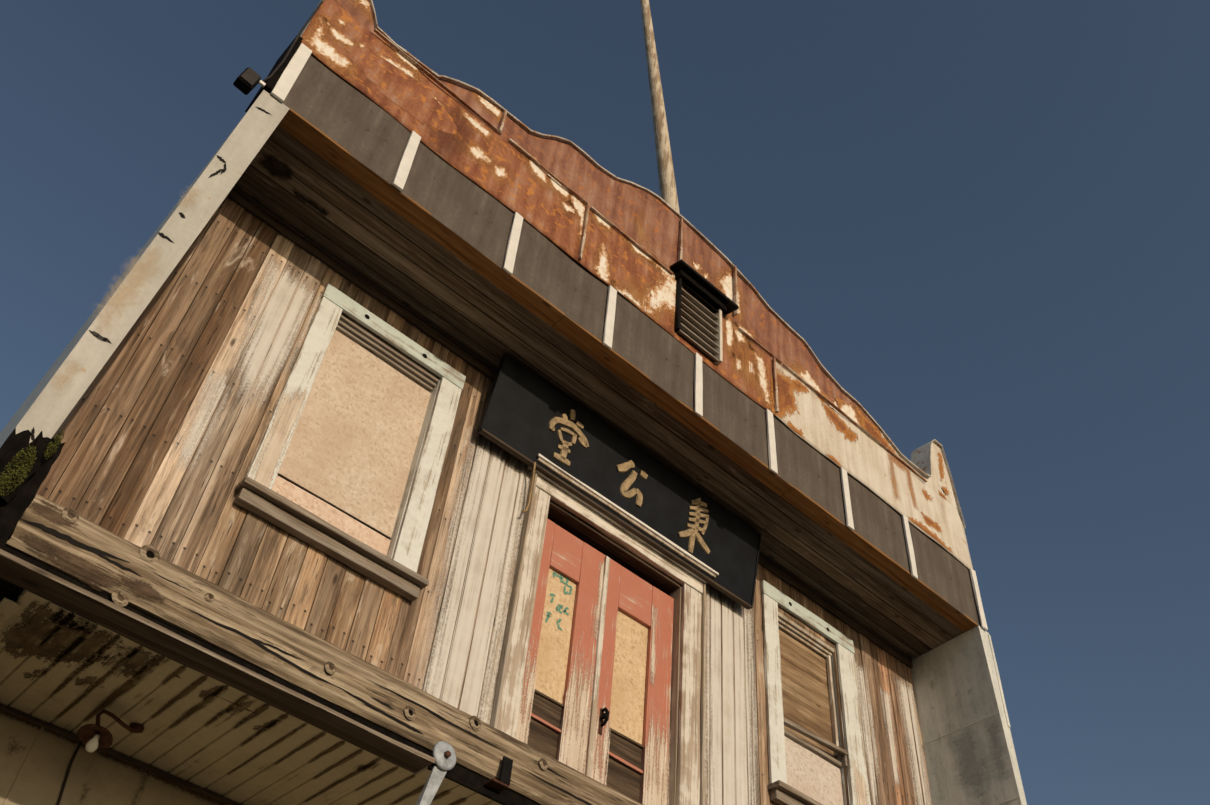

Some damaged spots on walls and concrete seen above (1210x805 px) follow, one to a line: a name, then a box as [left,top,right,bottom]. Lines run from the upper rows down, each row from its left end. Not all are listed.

peeling [302,16,420,80]
crack [158,212,186,242]
crack [208,155,226,178]
peeling [526,151,684,320]
crack [86,330,111,394]
rust [737,344,951,552]
crack [20,518,141,576]
leakage [53,635,120,694]
leakage [0,646,227,805]
leakage [152,677,466,805]
peeling [559,561,611,785]
peeling [705,590,758,805]